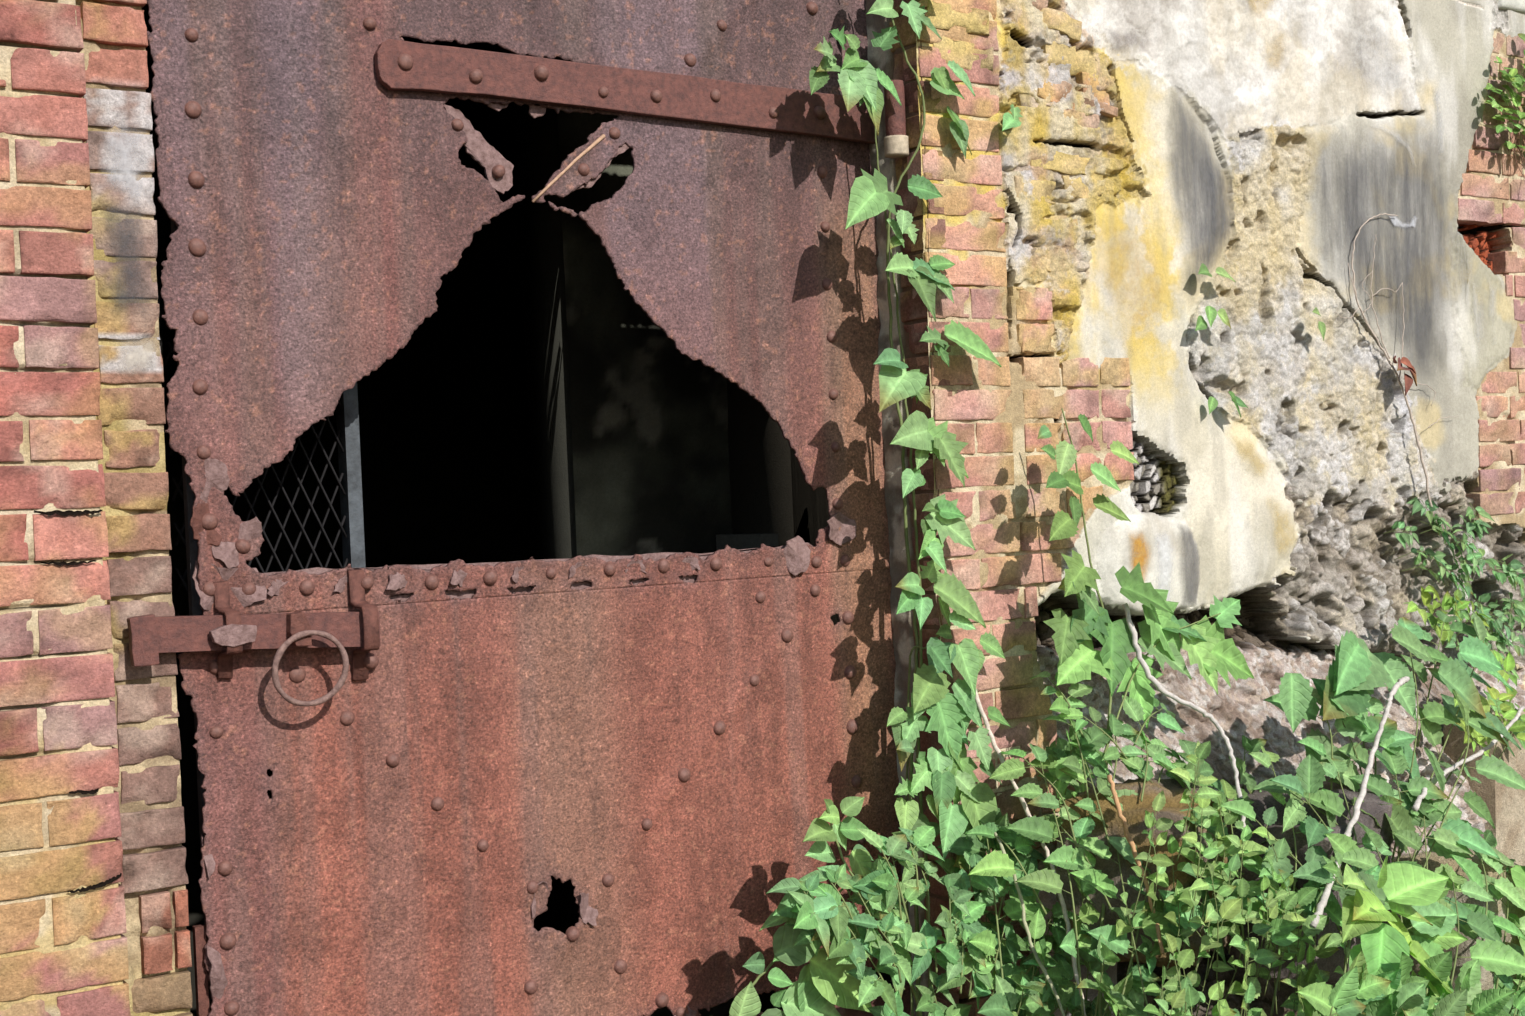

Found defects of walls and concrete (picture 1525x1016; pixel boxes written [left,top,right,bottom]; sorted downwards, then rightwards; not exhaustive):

crack [1395,0,1412,38]
rust [529,105,546,119]
crack [1033,63,1134,148]
crack [1356,109,1425,119]
water stain [1324,153,1442,363]
spalling [926,0,1525,857]
rust [190,458,289,611]
rust [827,512,857,546]
rust [783,536,811,576]
rust [209,624,257,647]
rust [579,893,598,926]
rust [206,946,228,999]